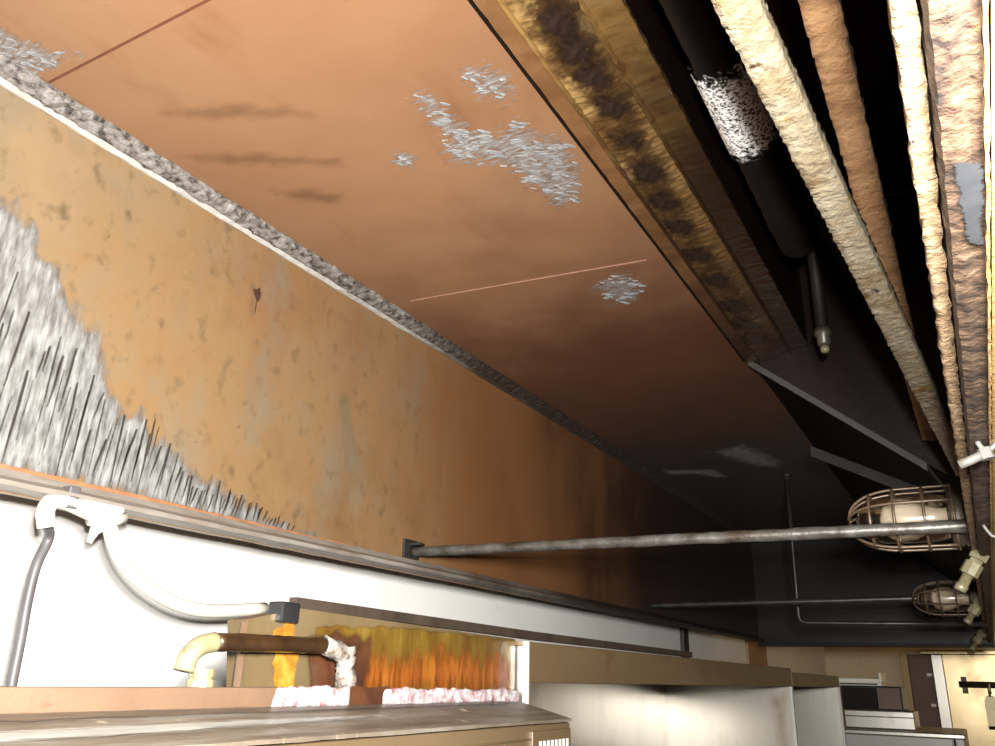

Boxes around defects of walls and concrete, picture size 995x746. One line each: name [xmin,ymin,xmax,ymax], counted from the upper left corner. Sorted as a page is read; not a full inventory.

peeling [0,206,295,530]